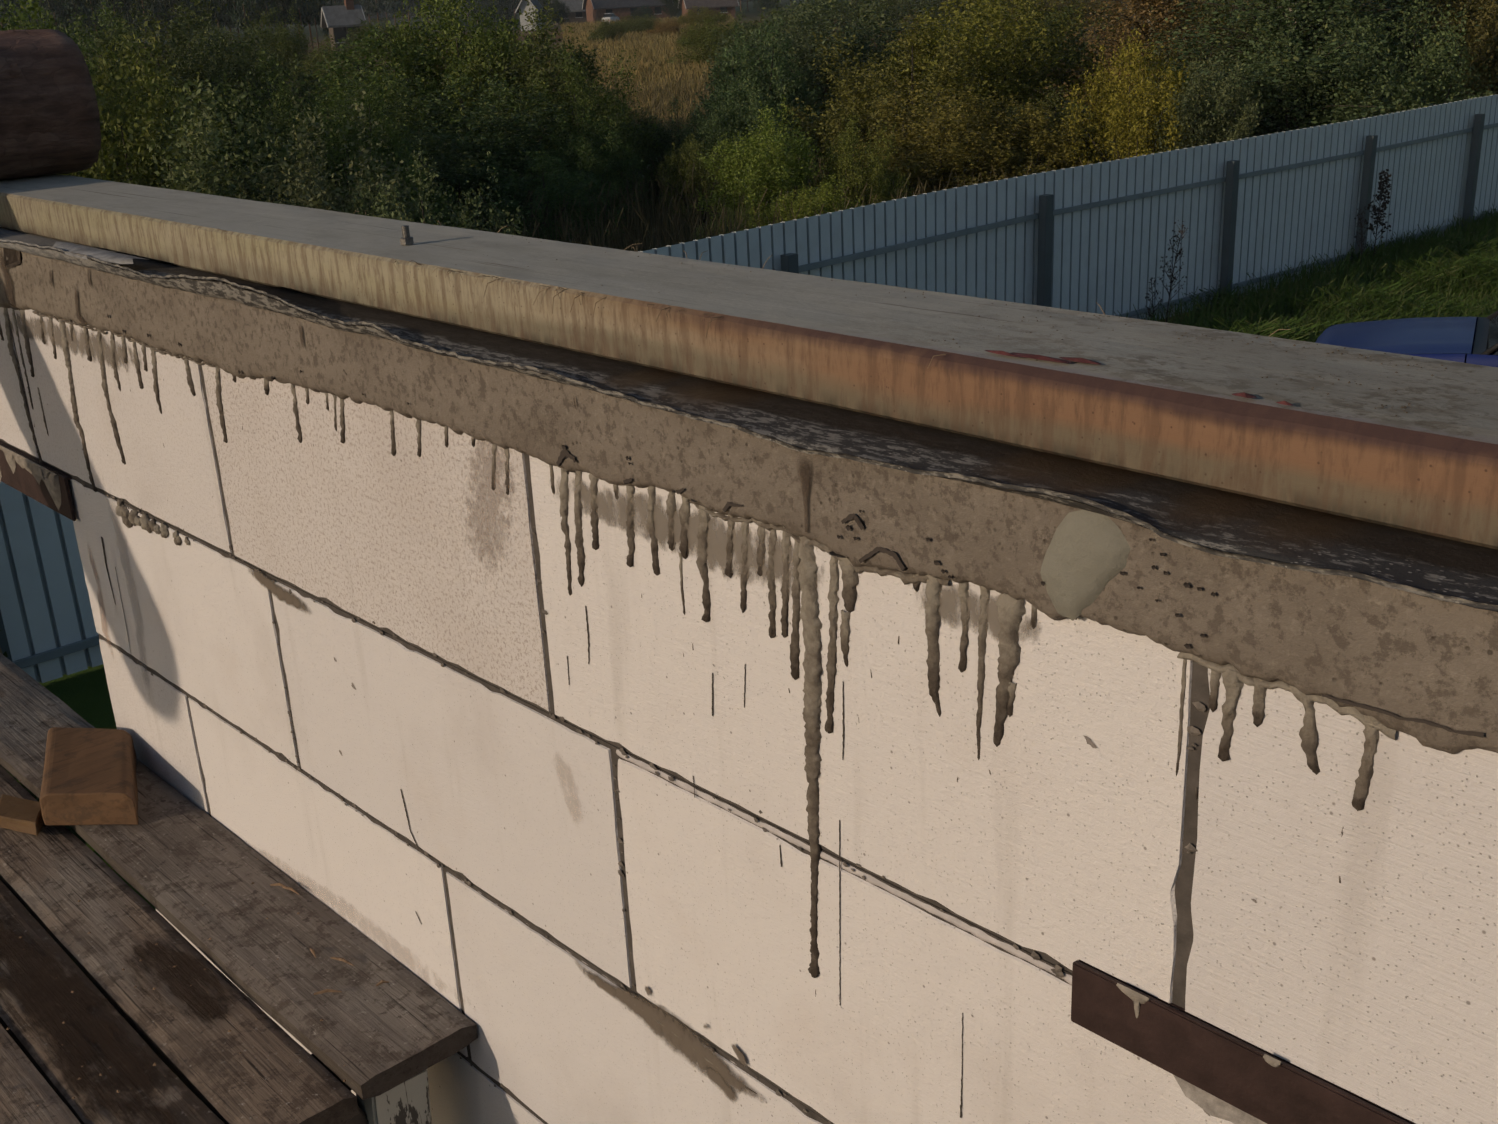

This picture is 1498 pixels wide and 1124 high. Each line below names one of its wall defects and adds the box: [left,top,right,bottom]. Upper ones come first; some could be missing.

leakage [0,255,162,492]
leakage [183,356,196,396]
leakage [215,367,236,443]
leakage [291,384,346,444]
leakage [471,436,510,495]
leakage [549,464,859,978]
leakage [913,574,1037,760]
leakage [1176,659,1187,777]
leakage [1209,664,1267,762]
leakage [1289,685,1320,775]
leakage [1352,715,1381,812]